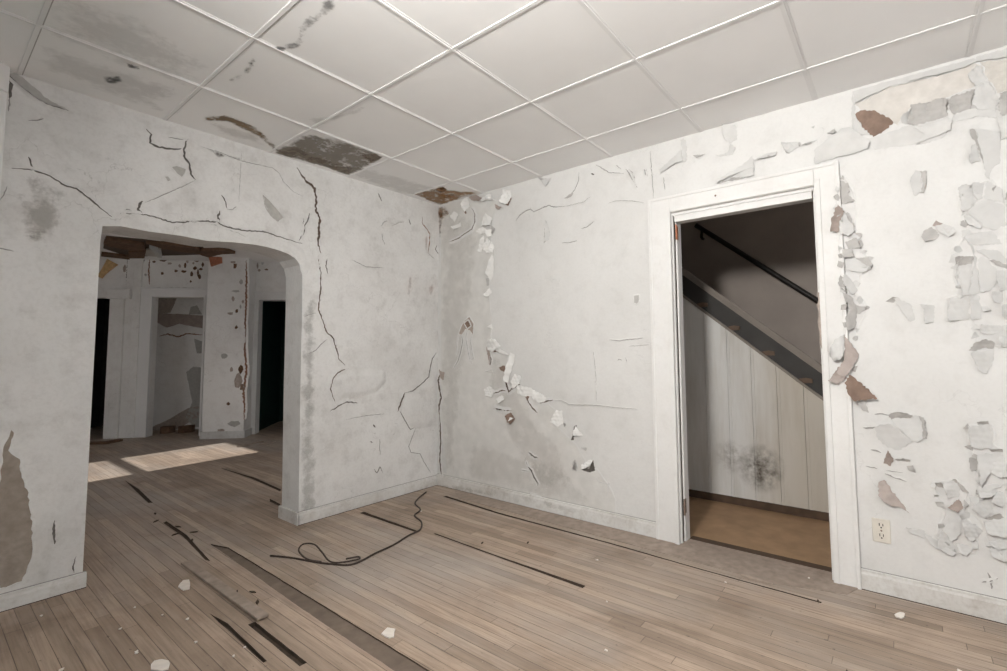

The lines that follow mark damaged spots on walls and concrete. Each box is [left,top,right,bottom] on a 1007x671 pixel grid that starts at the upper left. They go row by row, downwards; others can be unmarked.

crack [6,73,70,124]
peeling [143,247,268,431]
crack [0,128,447,475]
flaking render [440,189,617,513]
peeling [715,48,1007,374]
peeling [828,175,927,513]
flaking render [0,428,36,590]
peeling [906,421,1007,564]
crack [980,572,1001,590]